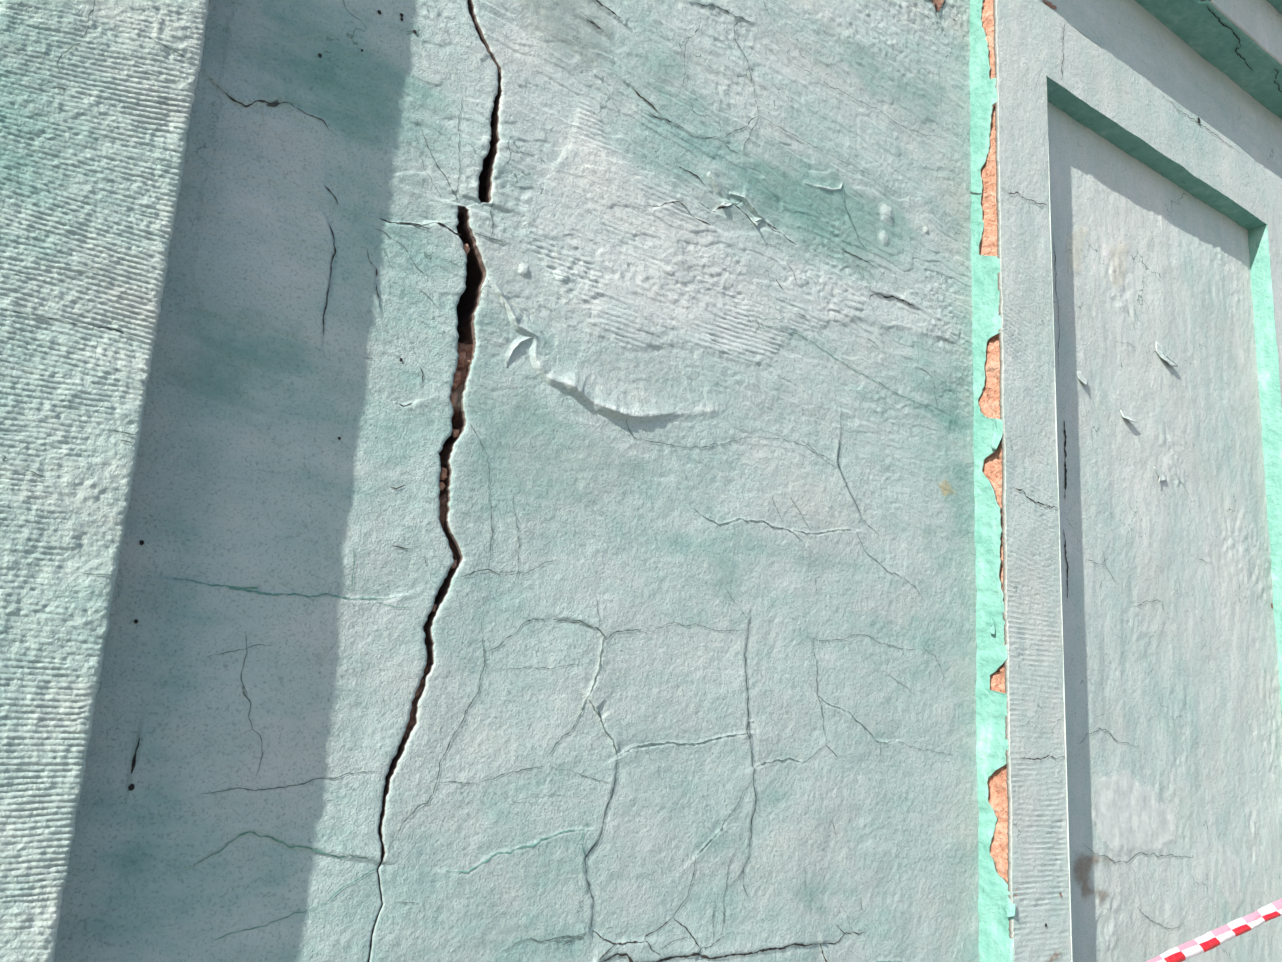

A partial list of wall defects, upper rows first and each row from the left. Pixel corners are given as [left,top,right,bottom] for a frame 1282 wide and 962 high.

flaking render [982,0,996,79]
flaking render [980,104,998,257]
crack [173,86,564,794]
crack [626,409,922,597]
flaking render [979,334,1010,602]
flaking render [991,664,1005,693]
crack [196,585,953,962]
flaking render [988,766,1017,918]